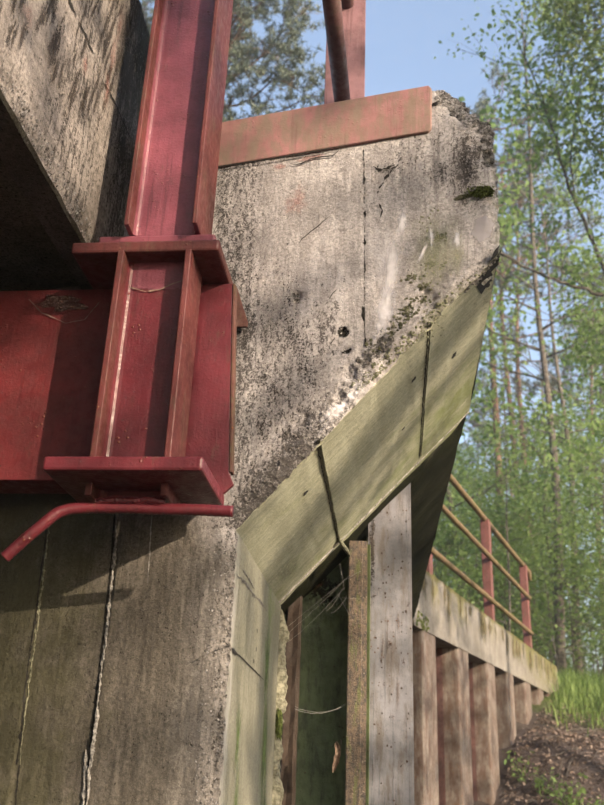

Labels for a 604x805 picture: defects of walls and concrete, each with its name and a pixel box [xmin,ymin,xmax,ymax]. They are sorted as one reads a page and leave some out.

leakage [0,0,142,131]
spalling [432,90,497,168]
crack [218,143,403,345]